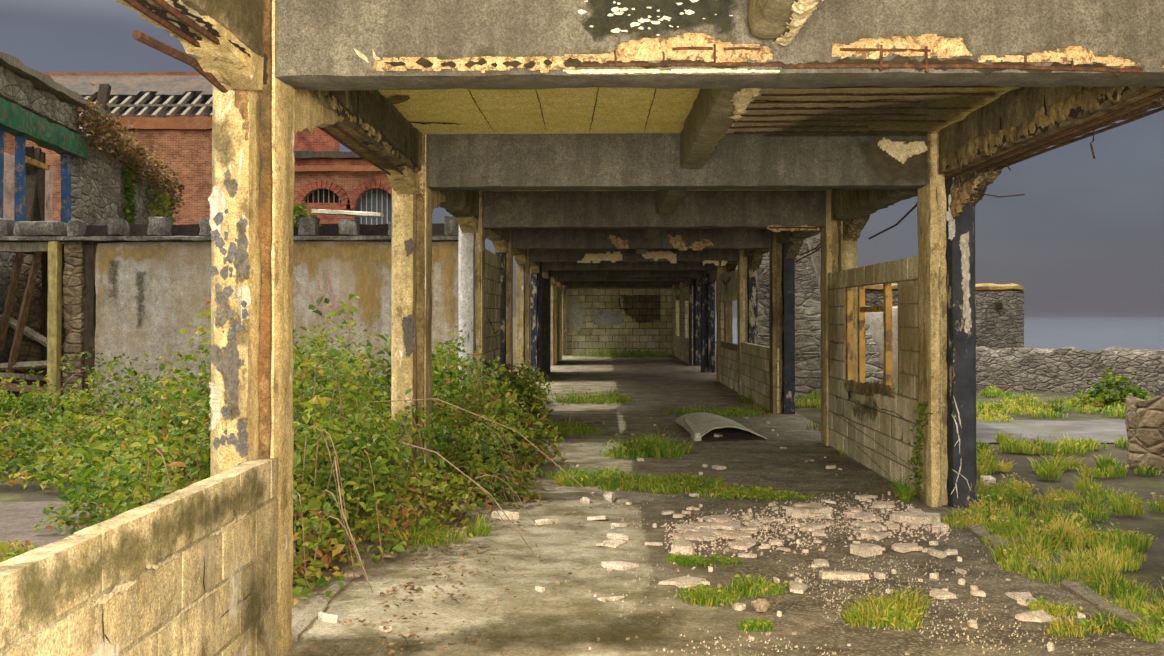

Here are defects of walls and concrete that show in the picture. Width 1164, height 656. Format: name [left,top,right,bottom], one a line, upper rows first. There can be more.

spalling [354,0,1164,180]
peeling [404,238,414,256]
peeling [577,235,629,263]
peeling [642,234,727,266]
peeling [946,194,972,333]
peeling [208,169,251,465]
damp [25,476,263,620]
damp [229,563,264,639]
damp [92,643,119,656]